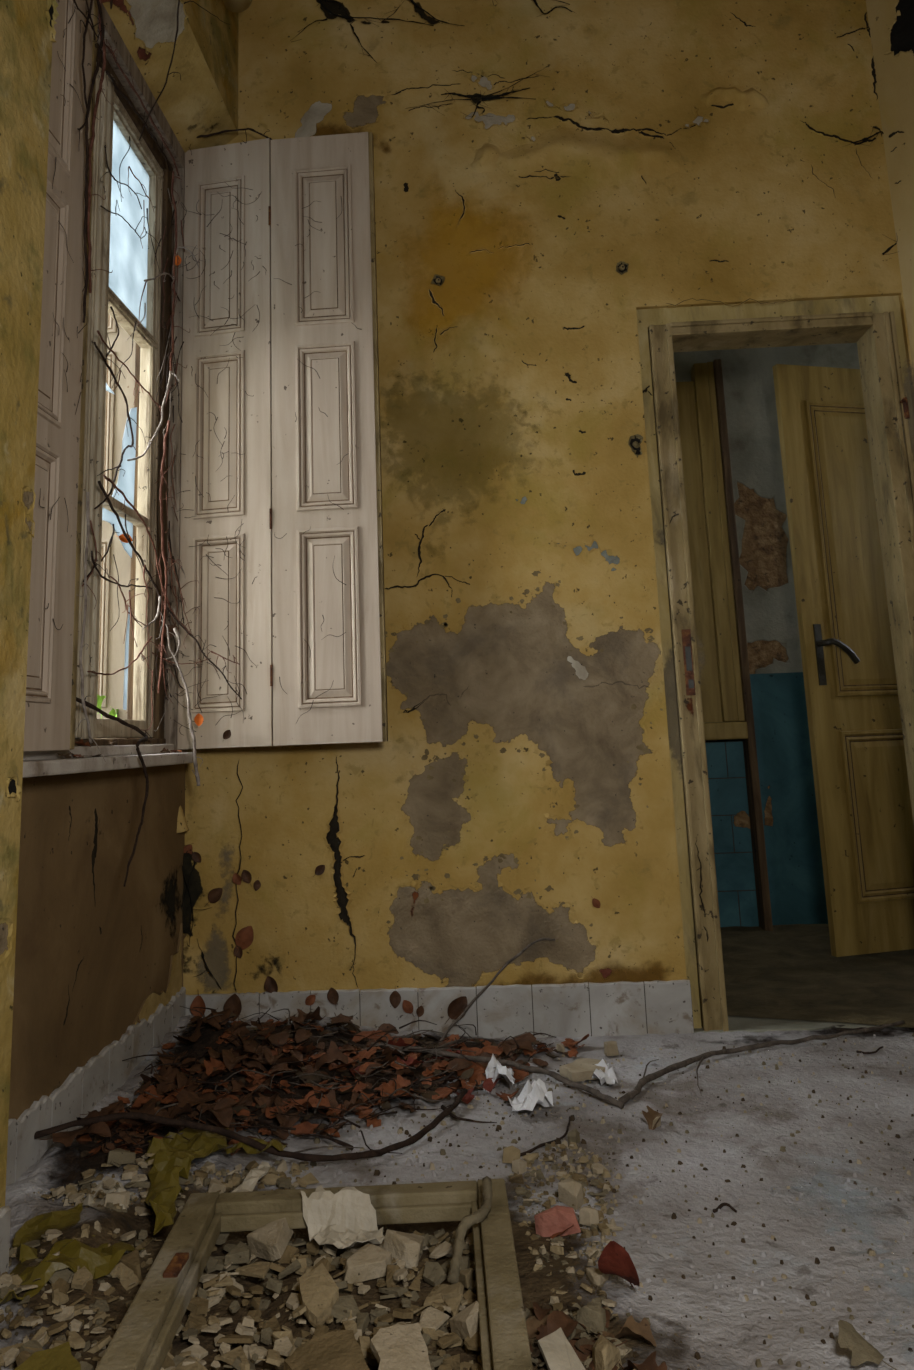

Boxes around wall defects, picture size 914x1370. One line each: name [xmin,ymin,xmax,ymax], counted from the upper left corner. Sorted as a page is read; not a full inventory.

flaking render [125,0,188,55]
flaking render [884,0,914,58]
crack [390,69,539,112]
crack [526,90,734,149]
crack [800,120,904,199]
peeling [376,571,663,988]
crack [323,755,365,988]